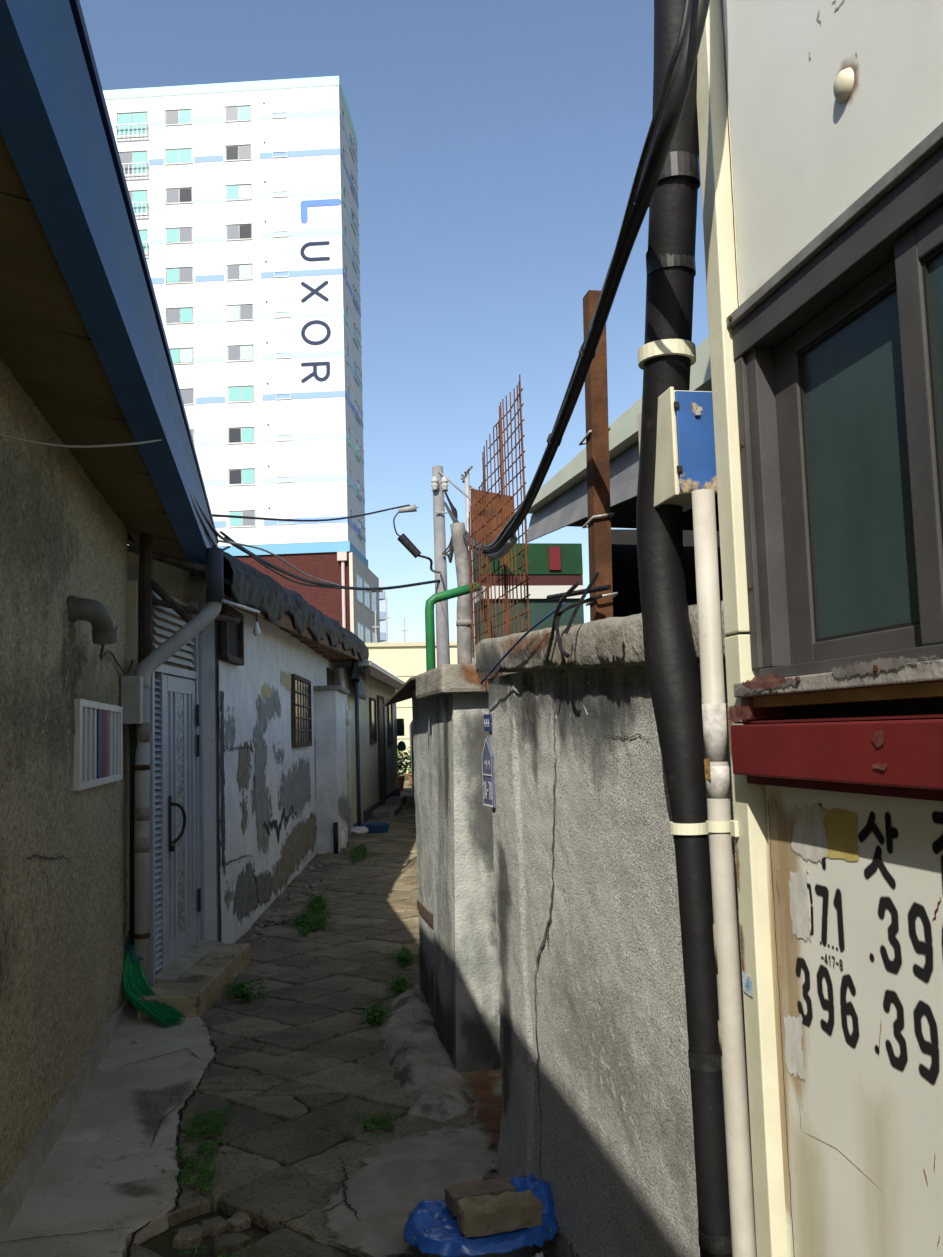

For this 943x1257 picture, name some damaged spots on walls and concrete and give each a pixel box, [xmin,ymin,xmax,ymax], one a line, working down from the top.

peeling [220,670,317,925]
water stain [418,715,511,1111]
crack [534,708,556,1179]
water stain [514,675,632,768]